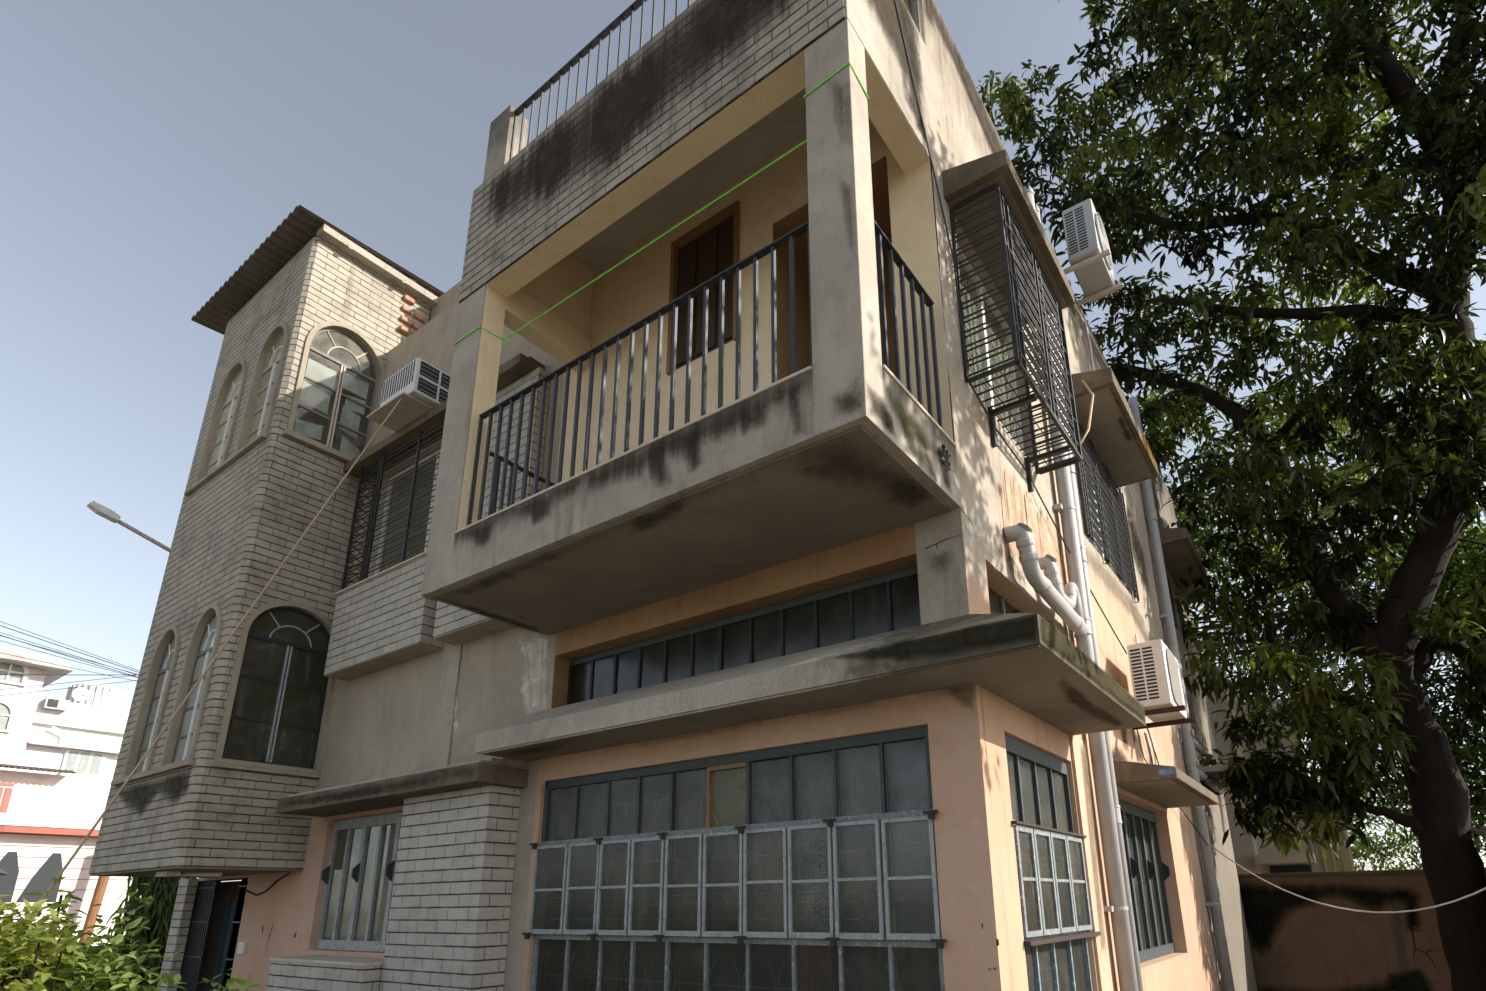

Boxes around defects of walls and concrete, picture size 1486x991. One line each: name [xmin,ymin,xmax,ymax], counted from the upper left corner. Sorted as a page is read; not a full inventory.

damp [490,0,785,211]
damp [870,0,1003,153]
damp [521,390,800,522]
damp [870,389,941,477]
damp [842,618,1146,761]